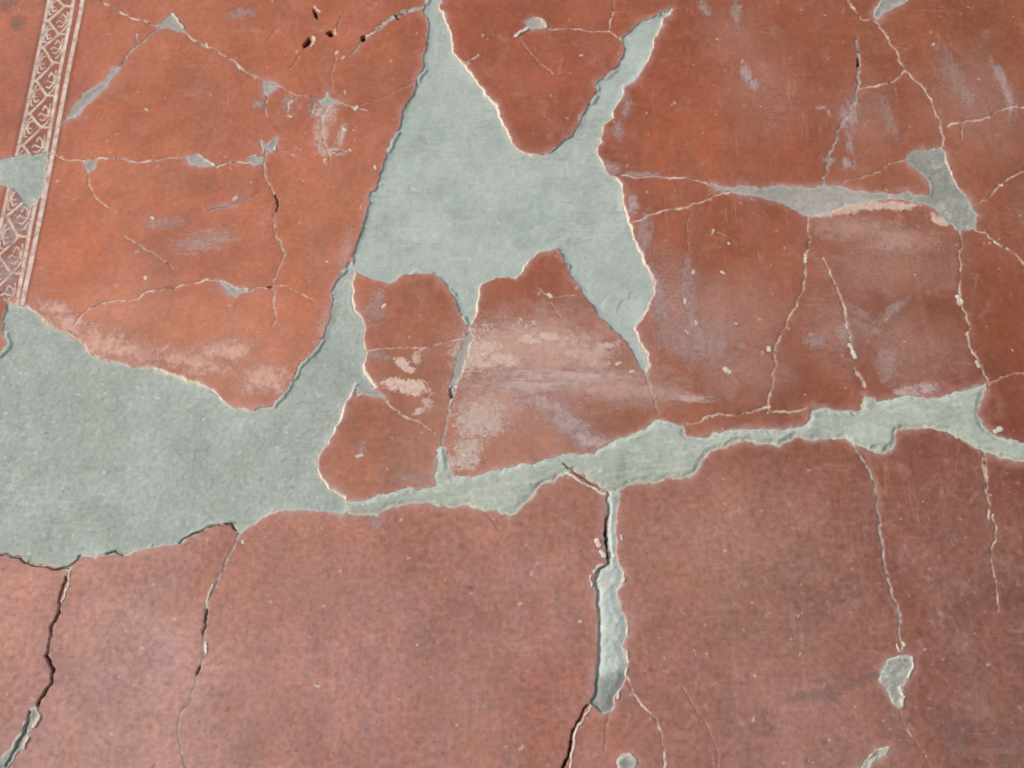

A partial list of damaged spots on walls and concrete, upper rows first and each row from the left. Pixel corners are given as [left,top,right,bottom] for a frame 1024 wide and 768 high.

crack [99,0,426,161]
crack [821,0,1024,186]
spalling [0,0,671,571]
crack [620,174,736,246]
crack [686,216,866,425]
spalling [713,148,978,232]
crack [955,171,1024,387]
crack [0,554,81,755]
peeling [589,538,606,587]
crack [852,446,904,655]
spalling [879,642,914,709]
crack [977,449,999,613]